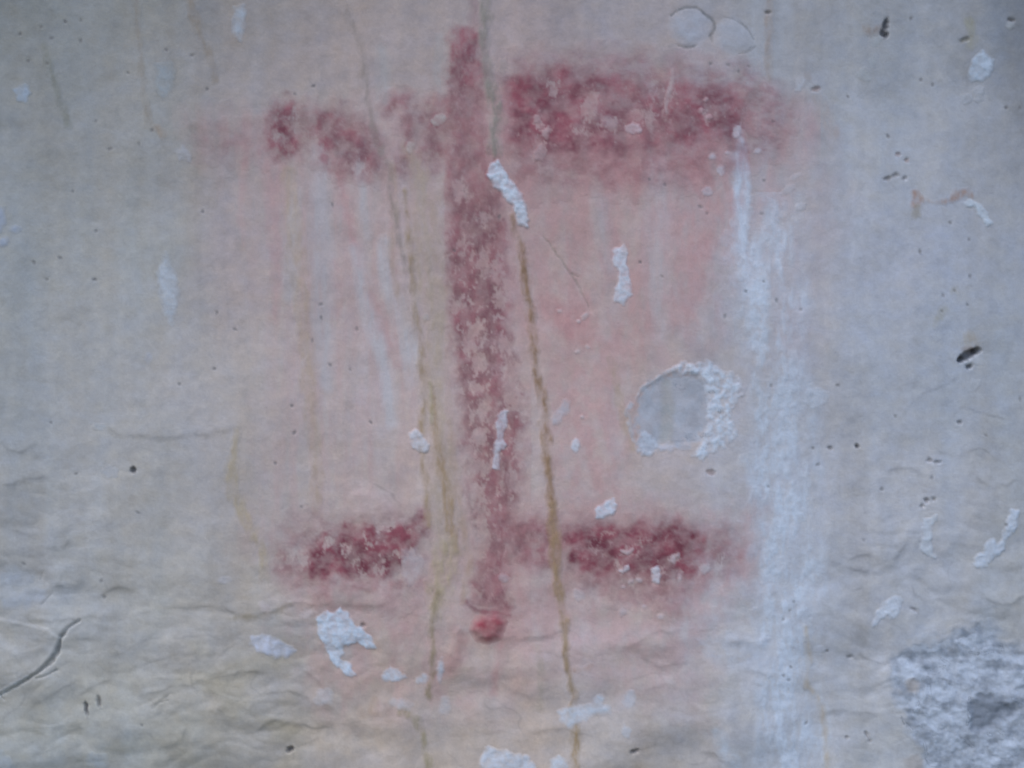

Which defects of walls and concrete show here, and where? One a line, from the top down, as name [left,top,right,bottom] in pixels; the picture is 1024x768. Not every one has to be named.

peeling [485,159,530,230]
peeling [611,243,634,307]
leakage [336,0,476,703]
spalling [622,359,748,477]
efflorescence [689,176,842,768]
peeling [972,507,1021,572]
crack [0,619,80,700]
peeling [248,632,297,660]
peeling [298,606,377,678]
peeling [556,689,637,730]
spalling [879,617,1024,768]